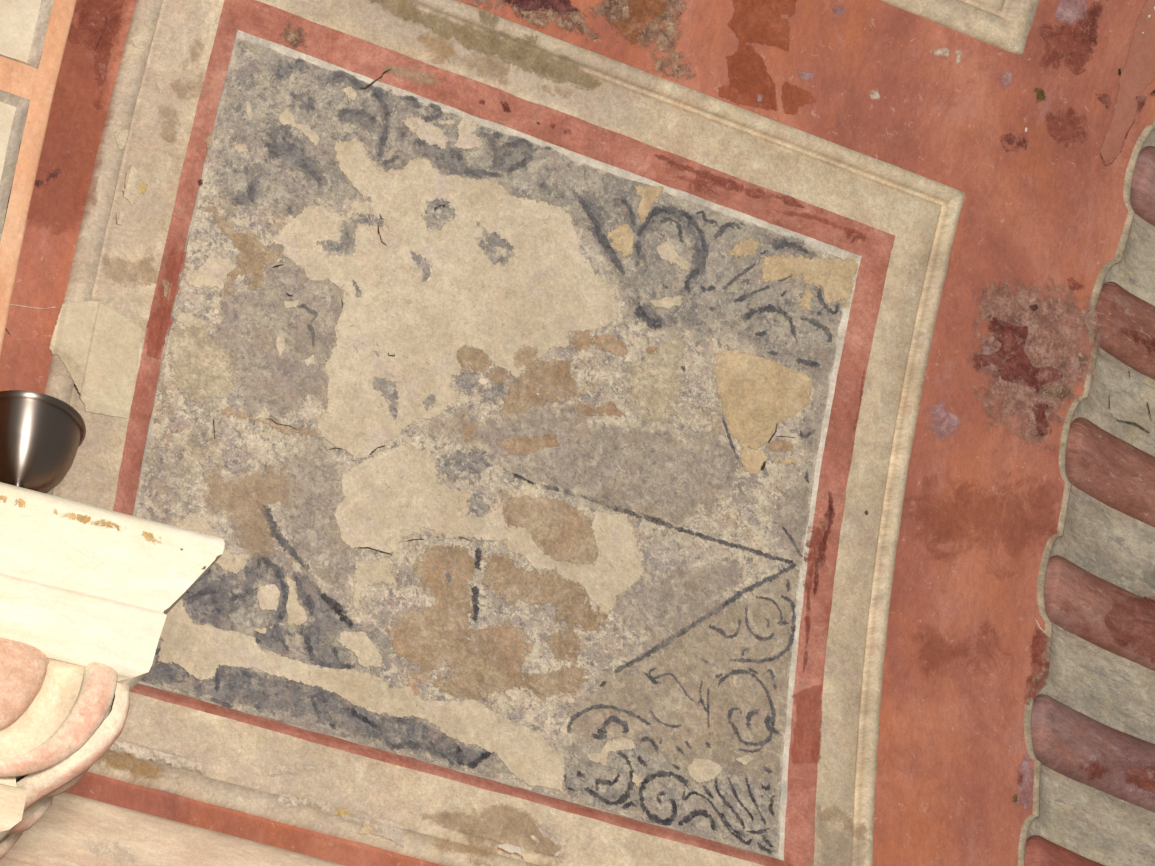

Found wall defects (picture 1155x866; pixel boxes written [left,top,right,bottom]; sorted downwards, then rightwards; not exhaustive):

peeling [371,0,599,90]
peeling [343,86,357,100]
peeling [279,107,320,146]
peeling [722,236,858,310]
peeling [146,116,812,792]
spalling [54,509,120,531]
peeling [109,740,206,773]
peeling [425,805,568,862]